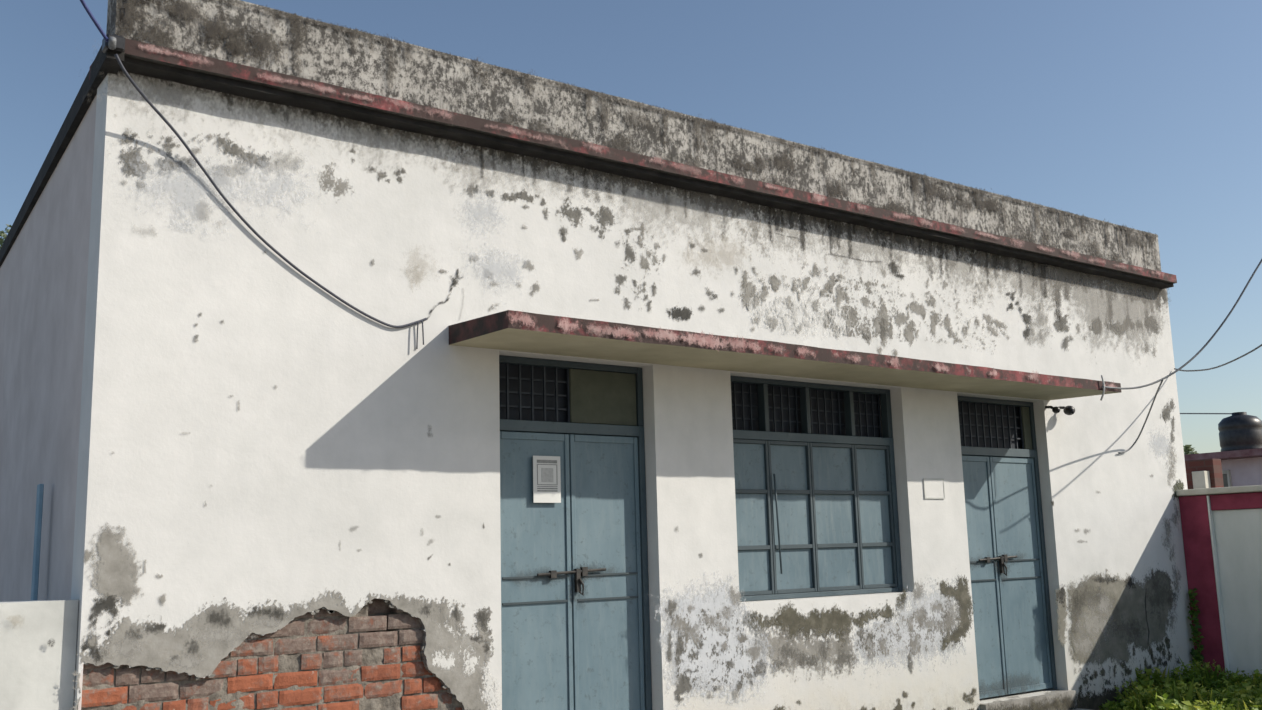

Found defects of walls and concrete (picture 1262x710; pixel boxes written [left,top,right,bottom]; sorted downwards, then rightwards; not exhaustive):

peeling [260,74,371,100]
damp [116,0,1169,330]
crack [427,269,463,320]
peeling [511,313,535,327]
peeling [467,185,666,311]
peeling [559,260,1032,369]
peeling [1056,401,1184,691]
peeling [72,524,498,710]
peeling [656,573,776,706]
peeling [853,577,973,673]